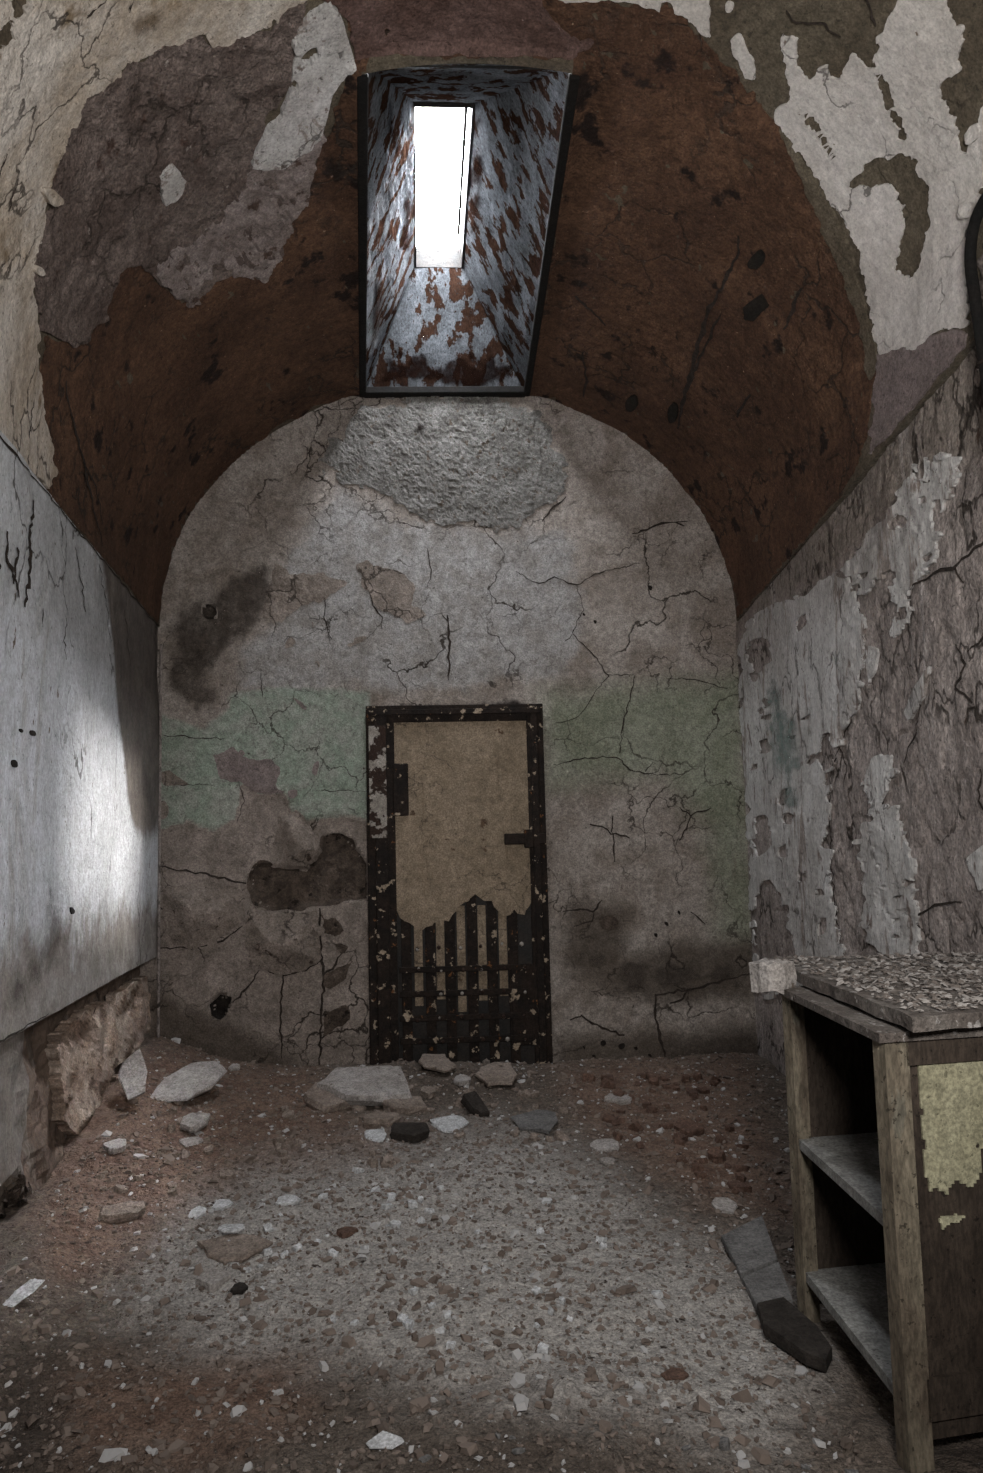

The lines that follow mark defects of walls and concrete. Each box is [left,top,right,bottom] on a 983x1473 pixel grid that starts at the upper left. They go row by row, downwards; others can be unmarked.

corrosion [402,191,416,249]
corrosion [471,154,482,233]
corrosion [382,352,511,386]
crack [0,380,155,662]
leakage [171,568,271,703]
crack [427,548,451,680]
spalling [0,0,983,1014]
crack [910,542,983,590]
crack [233,908,341,1065]
spalling [45,976,151,1135]
spalling [0,1174,32,1219]
peeling [3,1278,45,1307]